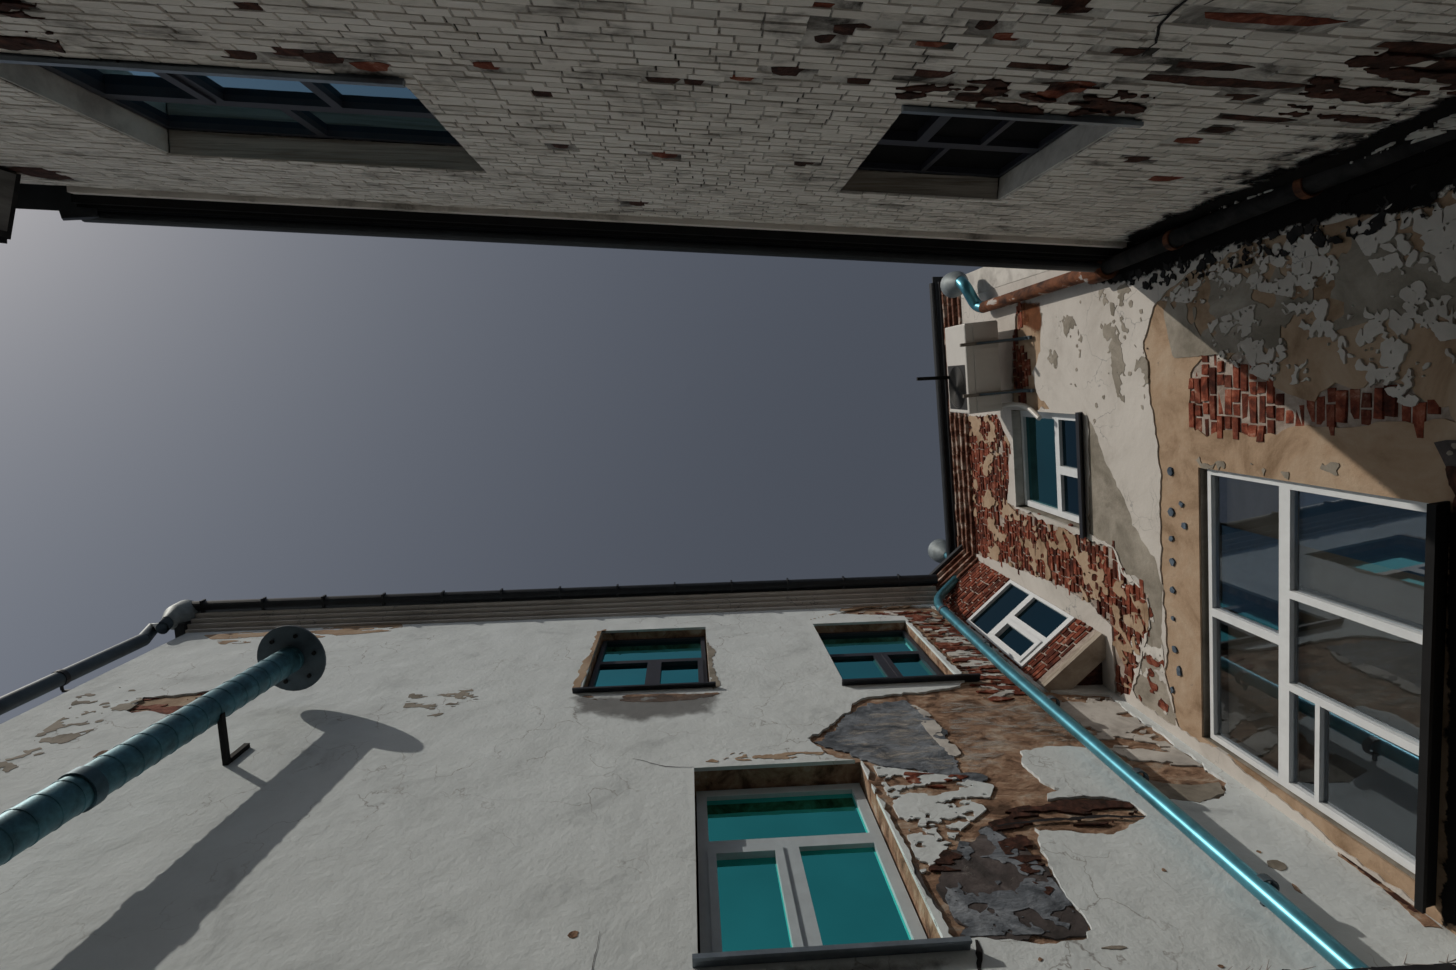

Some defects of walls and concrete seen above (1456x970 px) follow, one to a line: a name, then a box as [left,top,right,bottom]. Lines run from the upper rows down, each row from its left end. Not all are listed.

spalling [234,2,263,11]
spalling [1051,0,1094,13]
peeling [0,0,66,59]
spalling [809,2,871,43]
spalling [975,19,1019,41]
spalling [221,46,391,72]
spalling [472,62,500,70]
spalling [645,77,705,86]
spalling [771,66,805,76]
peeling [895,42,1456,164]
spalling [1124,156,1184,181]
flaking render [706,178,1456,961]